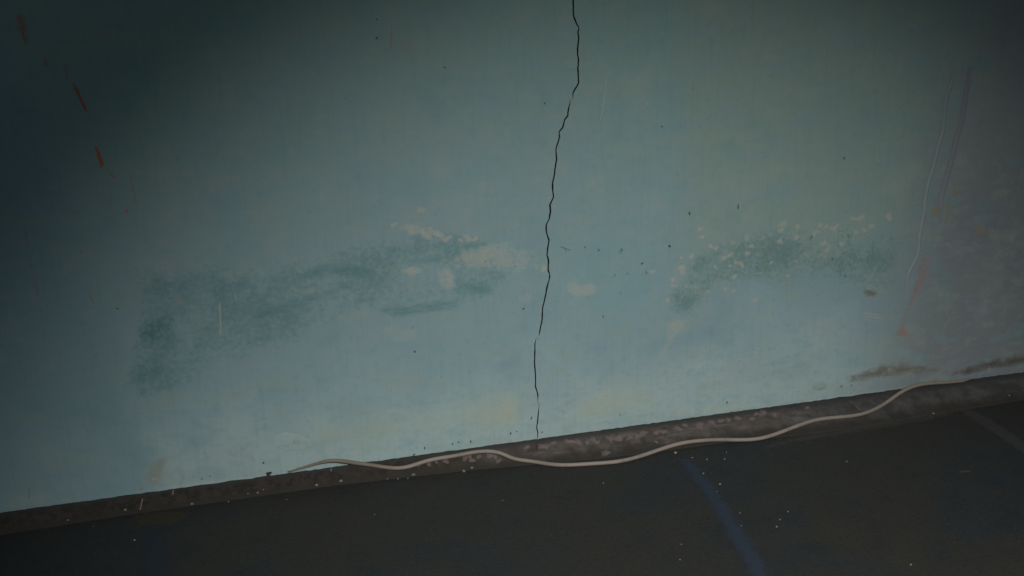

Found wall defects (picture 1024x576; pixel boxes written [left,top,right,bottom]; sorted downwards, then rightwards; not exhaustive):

crack [534,0,580,453]